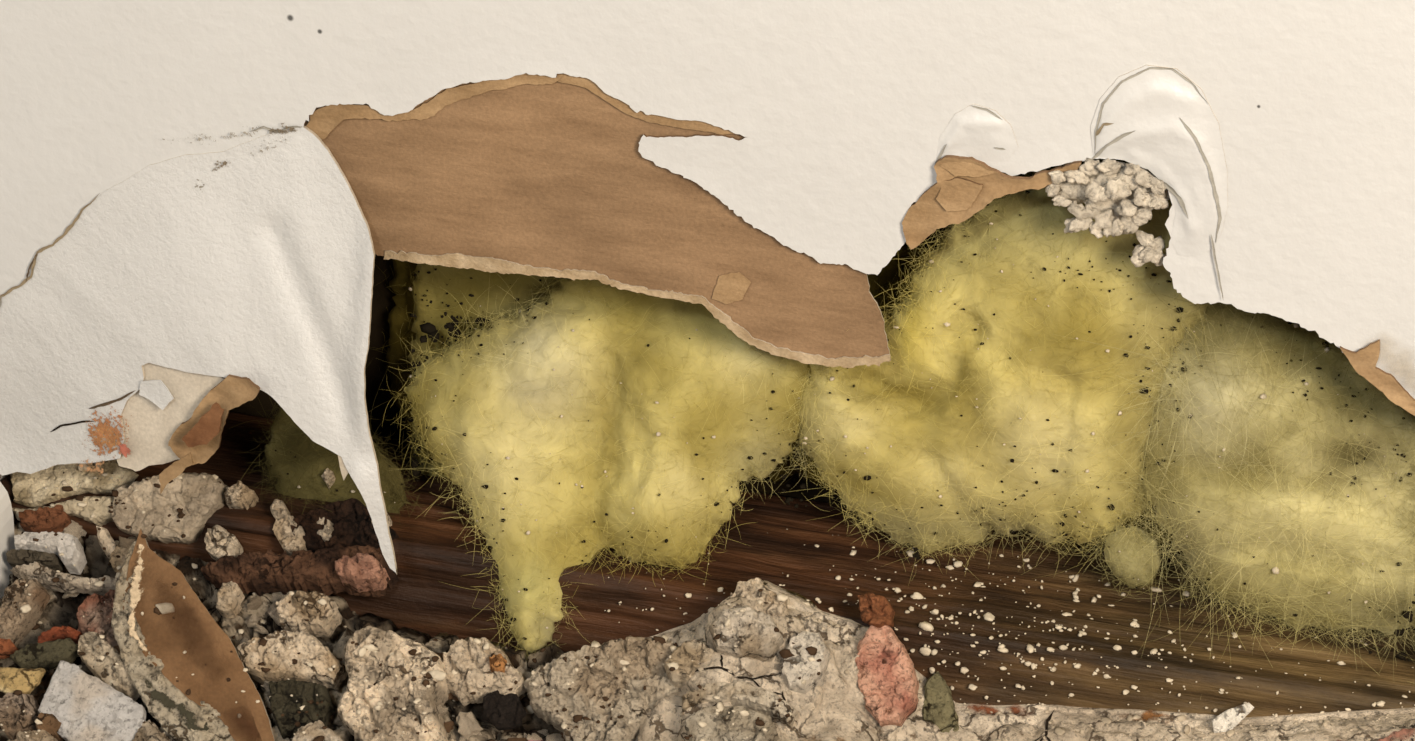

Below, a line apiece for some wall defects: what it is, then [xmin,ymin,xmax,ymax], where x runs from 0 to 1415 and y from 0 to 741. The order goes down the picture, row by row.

spalling [904,226,947,250]
spalling [1045,158,1170,267]
peeling [0,73,891,574]
water stain [408,294,490,386]
water stain [855,592,959,733]
water stain [1394,594,1415,661]
crack [1035,709,1055,741]
peeling [1211,703,1254,733]